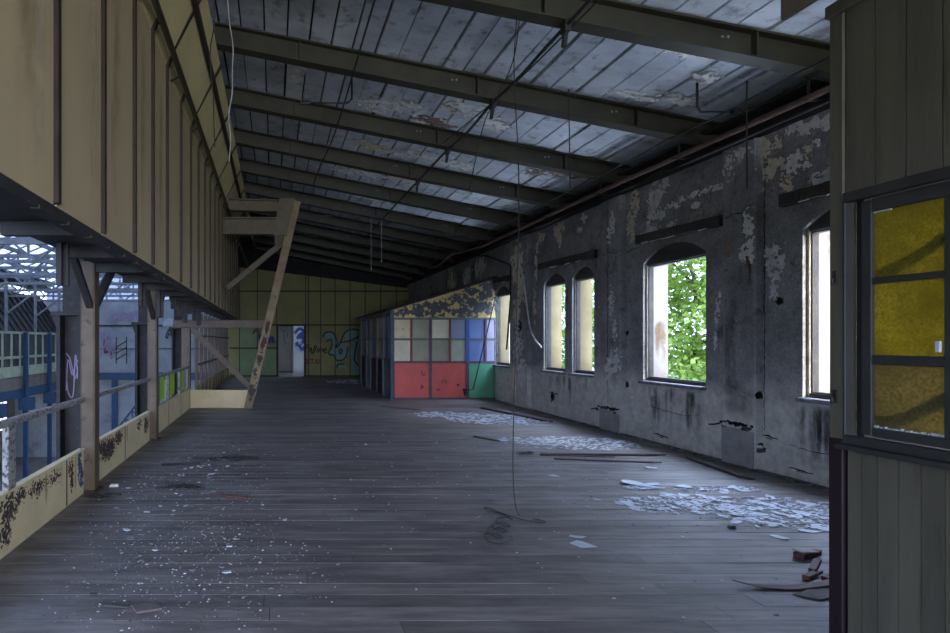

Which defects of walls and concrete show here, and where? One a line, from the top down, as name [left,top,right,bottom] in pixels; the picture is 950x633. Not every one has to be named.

peeling [358,93,512,133]
peeling [607,89,704,107]
peeling [606,113,830,245]
peeling [738,203,786,305]
spalling [708,419,778,453]